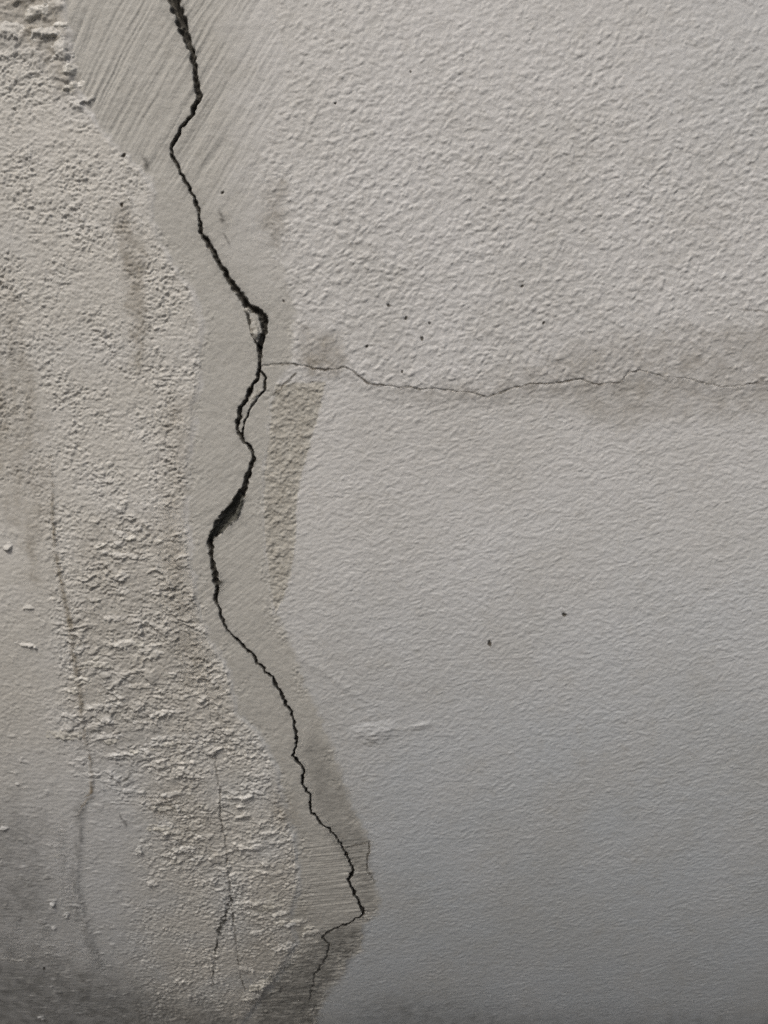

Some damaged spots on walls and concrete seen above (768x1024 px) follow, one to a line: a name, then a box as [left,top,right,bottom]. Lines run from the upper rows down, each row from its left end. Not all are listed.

crack [167,0,370,999]